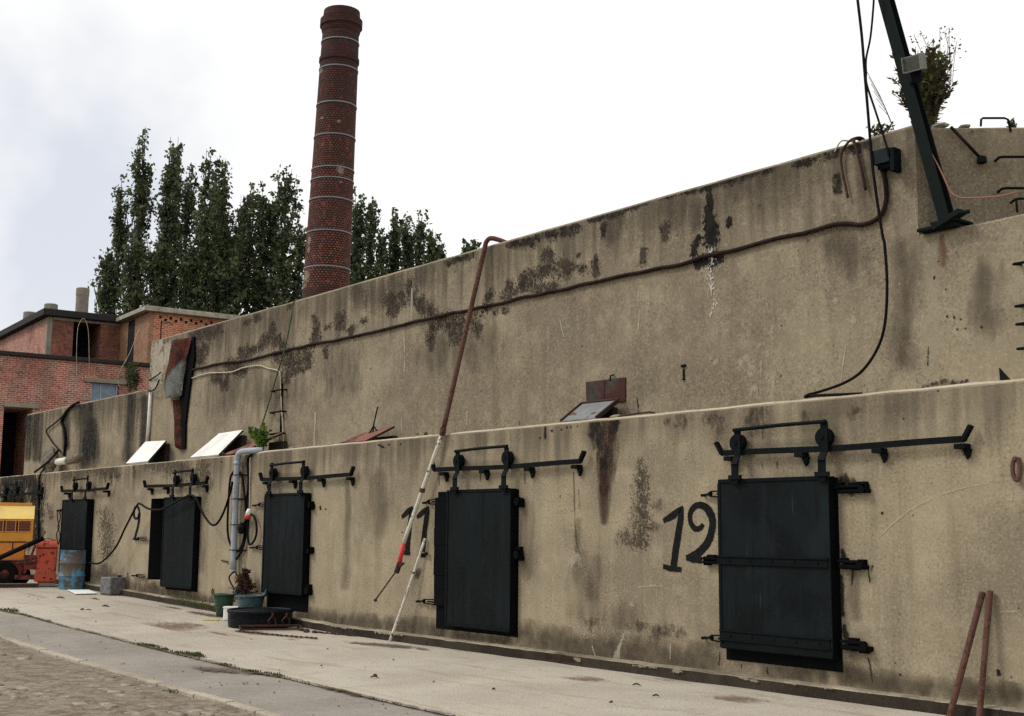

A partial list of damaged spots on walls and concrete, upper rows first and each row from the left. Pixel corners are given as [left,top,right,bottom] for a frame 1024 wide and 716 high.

damp [659,219,670,242]
damp [664,167,775,317]
damp [381,246,600,351]
damp [189,311,367,393]
corrosion [599,420,616,523]